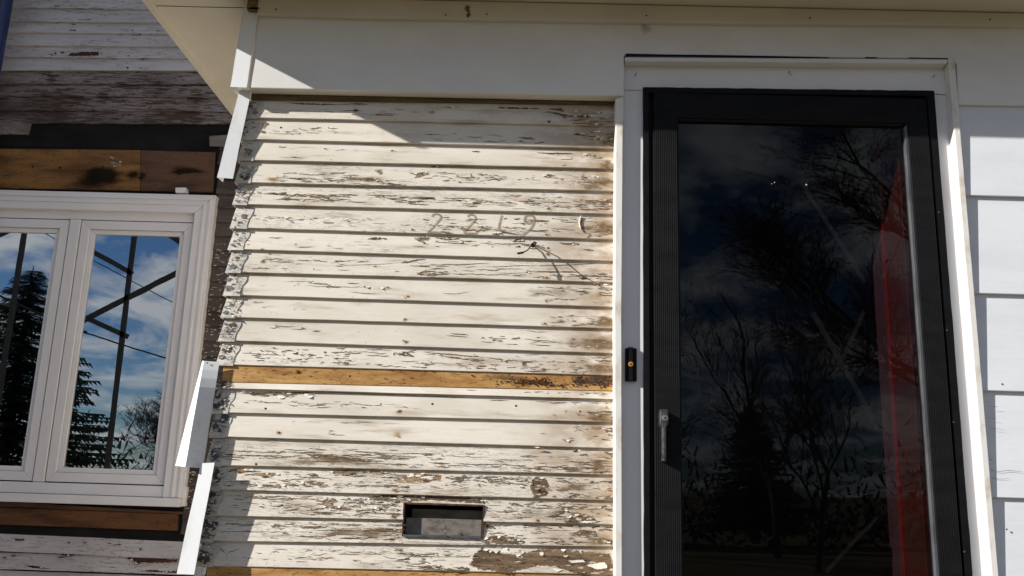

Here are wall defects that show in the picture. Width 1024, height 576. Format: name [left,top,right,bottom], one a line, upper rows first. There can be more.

peeling [219,102,269,362]
peeling [415,226,525,244]
peeling [197,380,486,564]
peeling [529,477,550,498]
peeling [471,509,613,576]